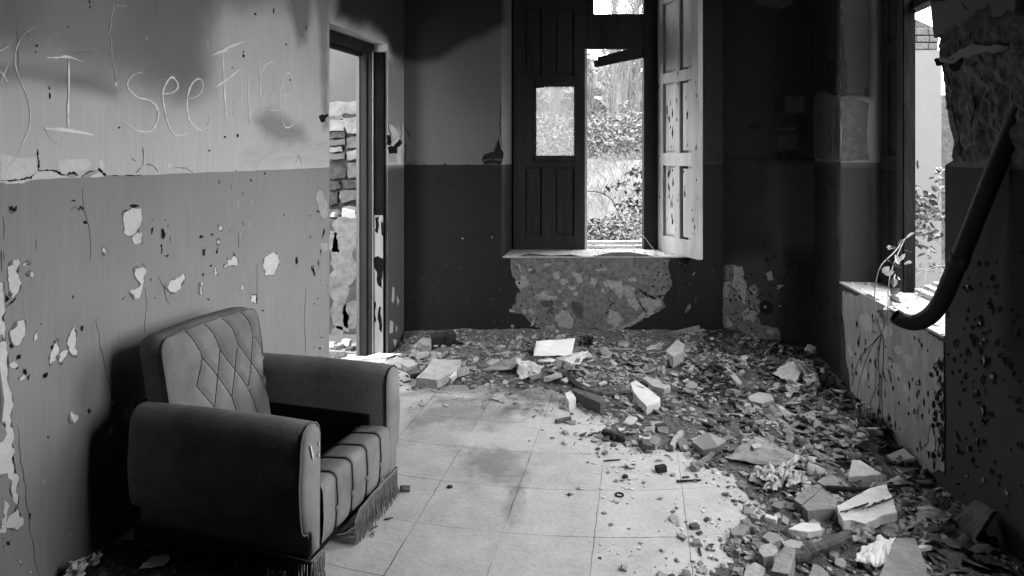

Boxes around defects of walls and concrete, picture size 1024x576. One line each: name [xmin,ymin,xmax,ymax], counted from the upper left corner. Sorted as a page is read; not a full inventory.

spalling [934,9,1024,165]
crack [0,147,192,258]
peeling [122,265,152,300]
peeling [122,204,171,257]
peeling [154,272,186,298]
peeling [198,224,239,300]
peeling [262,252,280,277]
peeling [310,189,356,357]
peeling [506,252,696,330]
peeling [712,263,785,341]
peeling [43,325,84,378]
peeling [0,259,42,548]